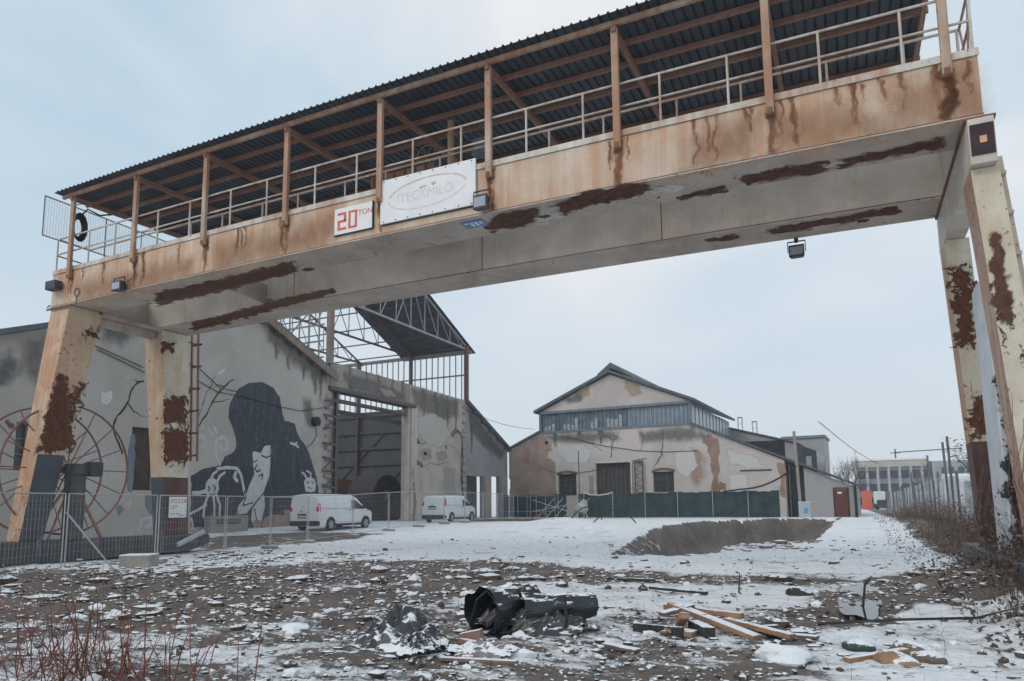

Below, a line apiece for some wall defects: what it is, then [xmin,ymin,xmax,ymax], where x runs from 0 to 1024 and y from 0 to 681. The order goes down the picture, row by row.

rust [483,137,651,233]
rust [691,107,753,163]
rust [767,83,864,153]
rust [740,137,946,186]
rust [878,60,971,120]
rust [767,207,902,234]
rust [67,217,333,307]
rust [189,288,336,331]
crack [113,380,146,455]
crack [585,431,664,468]
flaking render [675,434,787,498]